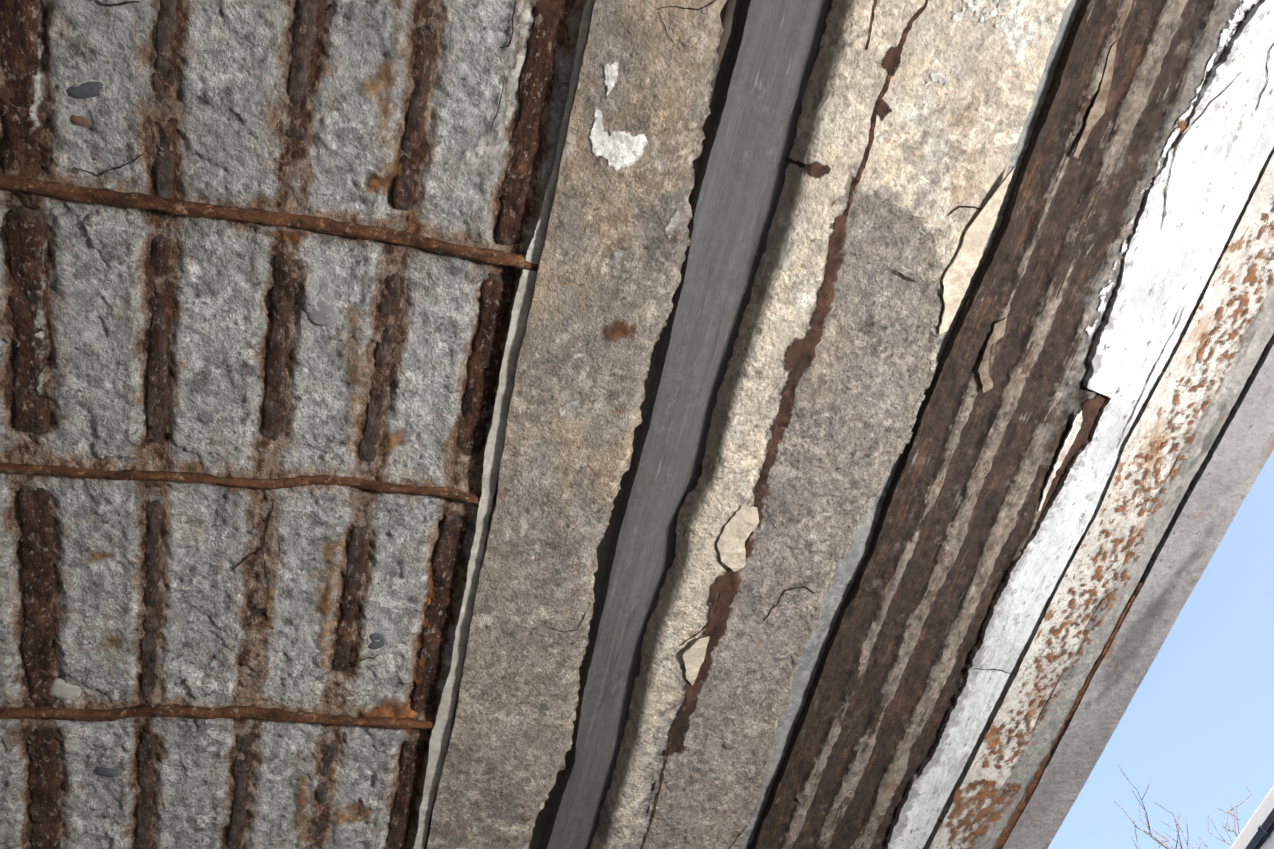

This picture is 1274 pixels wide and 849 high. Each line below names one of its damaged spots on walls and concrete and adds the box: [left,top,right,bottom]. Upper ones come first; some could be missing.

peeling [590,109,648,171]
crack [844,0,929,217]
crack [892,270,915,282]
crack [947,206,981,217]
spalling [0,0,594,849]
rust [318,541,342,641]
rust [662,215,848,756]
spalling [643,166,1015,849]
peeling [1037,394,1107,511]
rust [946,198,1274,849]
rust [366,698,416,732]
crack [641,686,691,849]